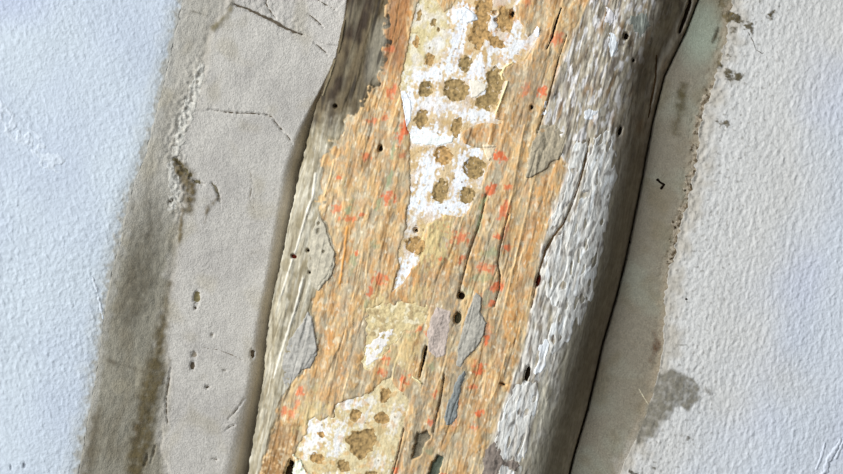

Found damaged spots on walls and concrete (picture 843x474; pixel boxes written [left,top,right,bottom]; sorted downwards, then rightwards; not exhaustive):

crack [234,0,332,53]
crack [225,112,291,141]
peeling [392,0,540,292]
water stain [128,317,164,474]
peeling [285,378,409,474]
water stain [637,370,699,443]